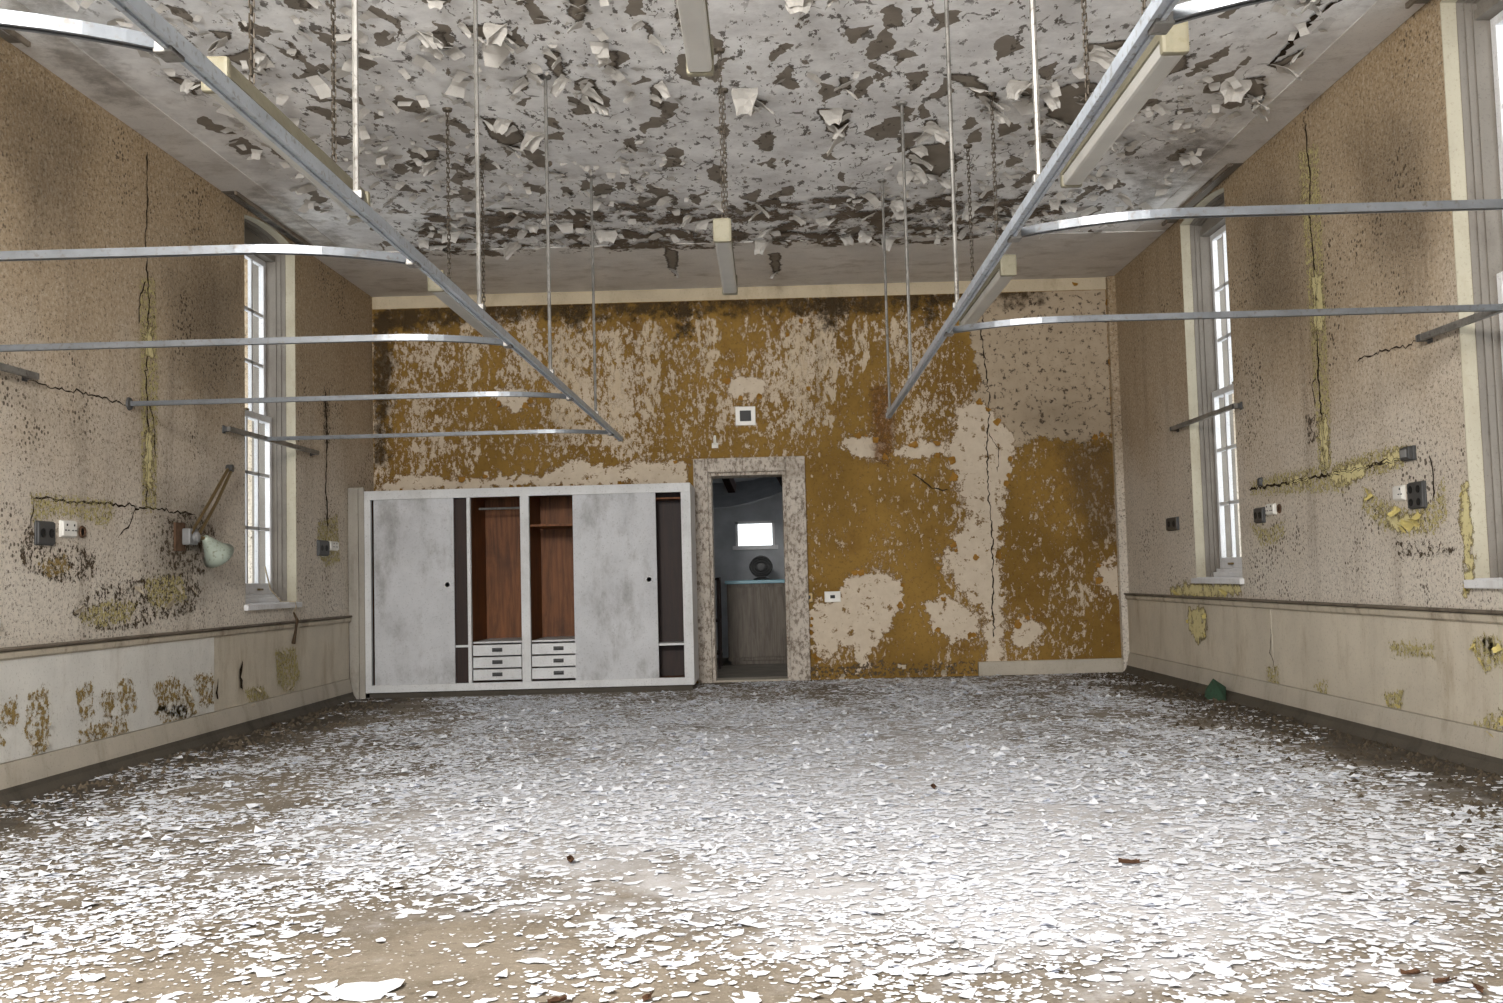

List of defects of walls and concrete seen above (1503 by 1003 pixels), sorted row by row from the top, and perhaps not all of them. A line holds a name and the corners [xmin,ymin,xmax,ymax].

peeling [106,18,133,28]
peeling [137,50,201,96]
peeling [155,0,1327,279]
peeling [459,322,583,436]
peeling [601,318,667,438]
spalling [20,277,216,632]
peeling [378,454,691,491]
peeling [693,282,1111,678]
peeling [1093,554,1119,598]
peeling [1469,633,1503,674]
peeling [0,680,52,755]
peeling [76,672,214,743]